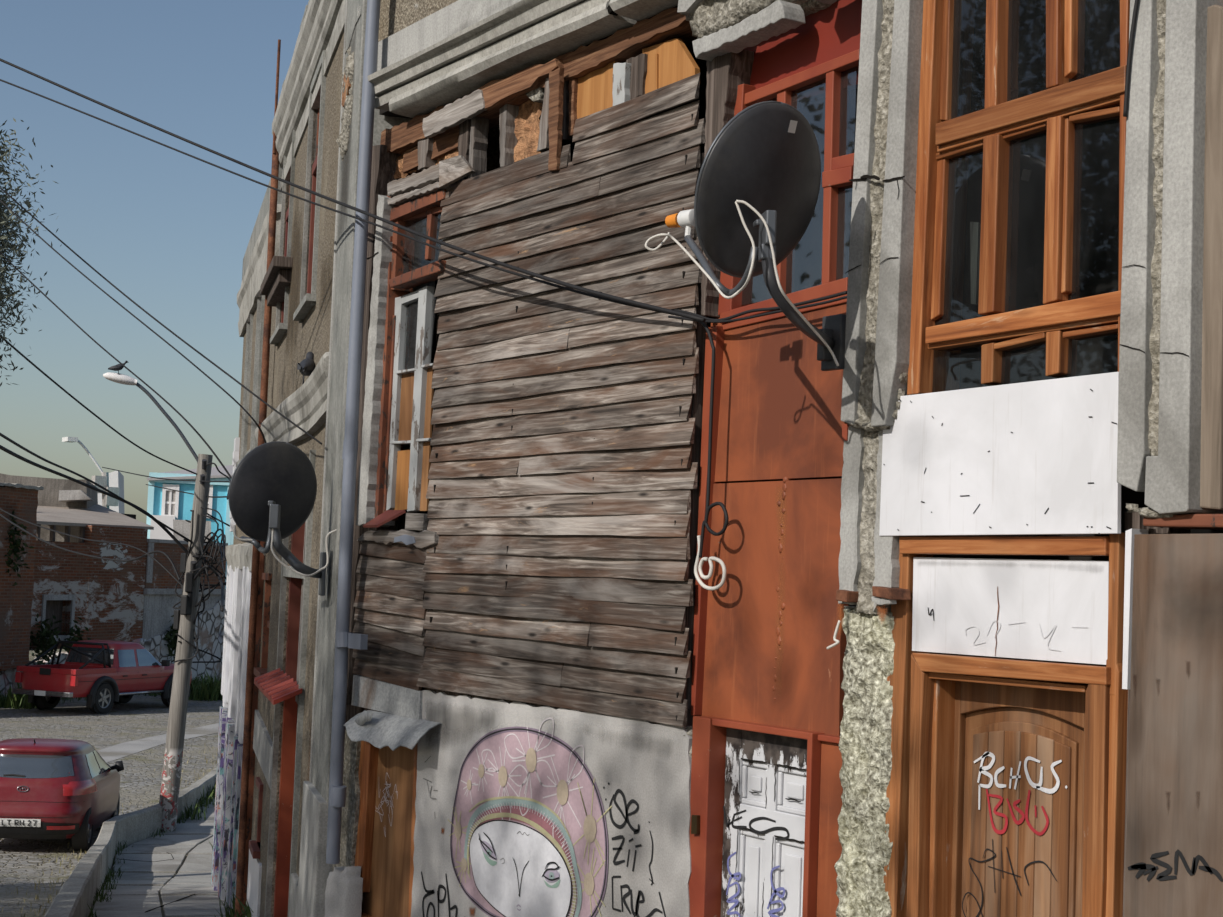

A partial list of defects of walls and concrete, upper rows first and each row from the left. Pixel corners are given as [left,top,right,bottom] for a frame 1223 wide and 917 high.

crack [849,175,905,199]
peeling [100,543,128,570]